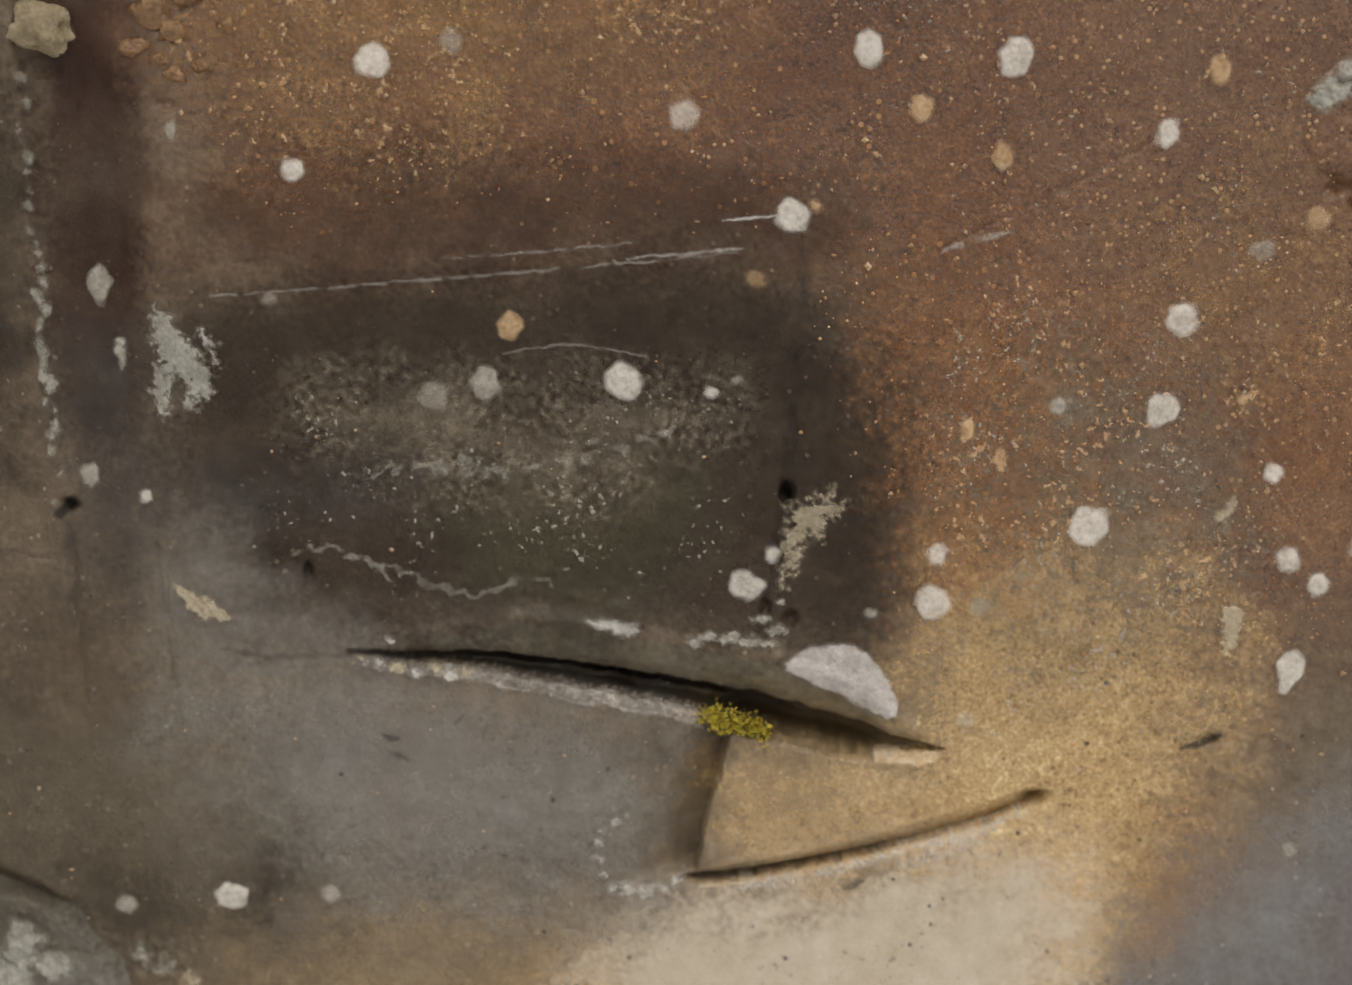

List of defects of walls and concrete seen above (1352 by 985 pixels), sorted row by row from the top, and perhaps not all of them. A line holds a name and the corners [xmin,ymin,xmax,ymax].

water stain [210,357,483,510]
water stain [443,390,703,605]
water stain [596,623,635,633]
spalling [0,914,130,985]